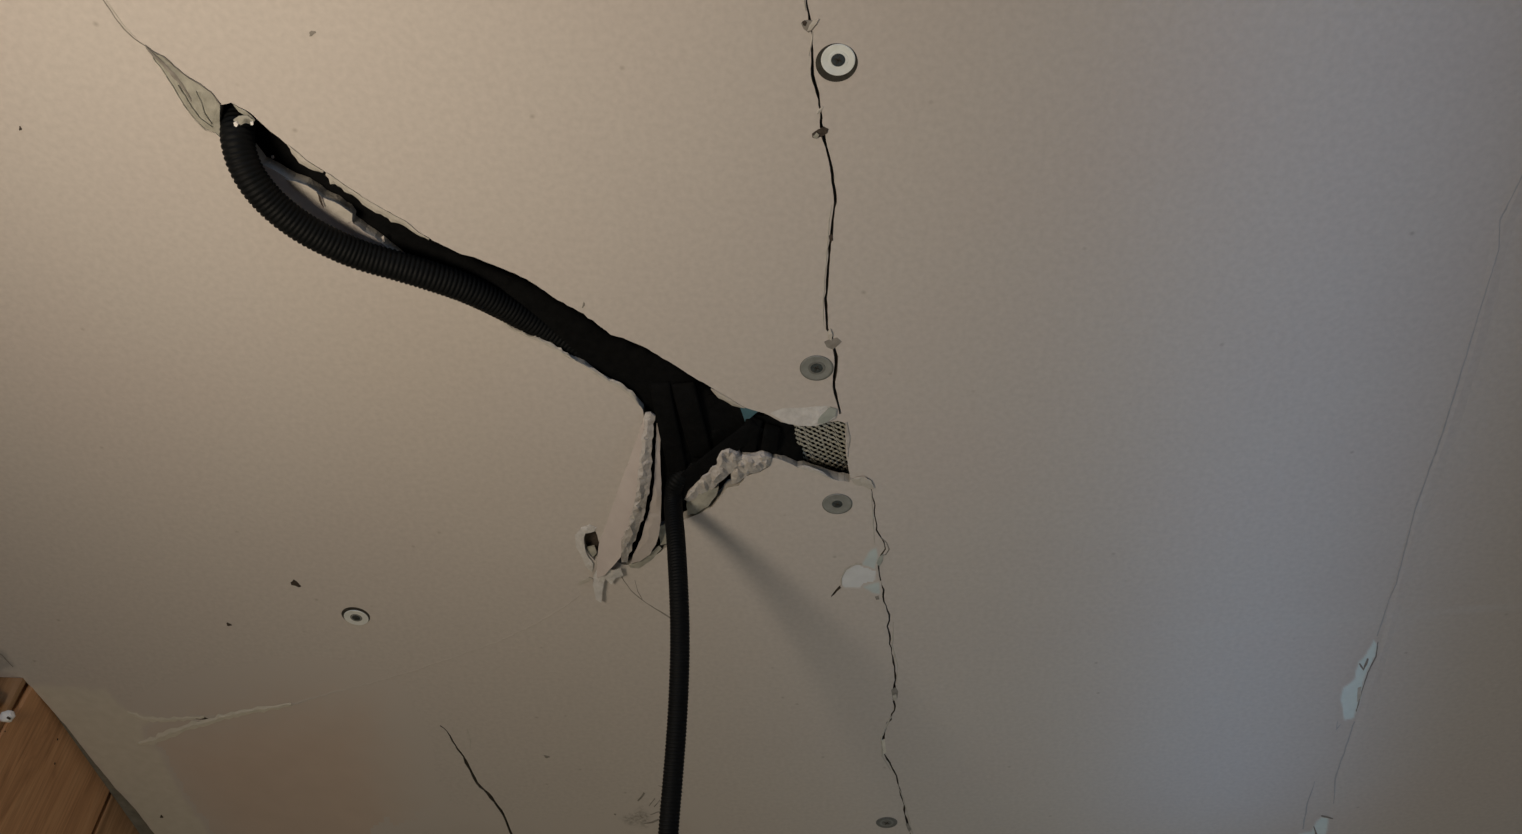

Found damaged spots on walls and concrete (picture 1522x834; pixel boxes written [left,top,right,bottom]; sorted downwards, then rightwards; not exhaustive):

crack [103,0,144,45]
crack [801,0,842,413]
peeling [771,406,837,426]
spalling [684,448,772,502]
crack [871,489,913,834]
peeling [1338,639,1379,722]
crack [440,725,512,834]